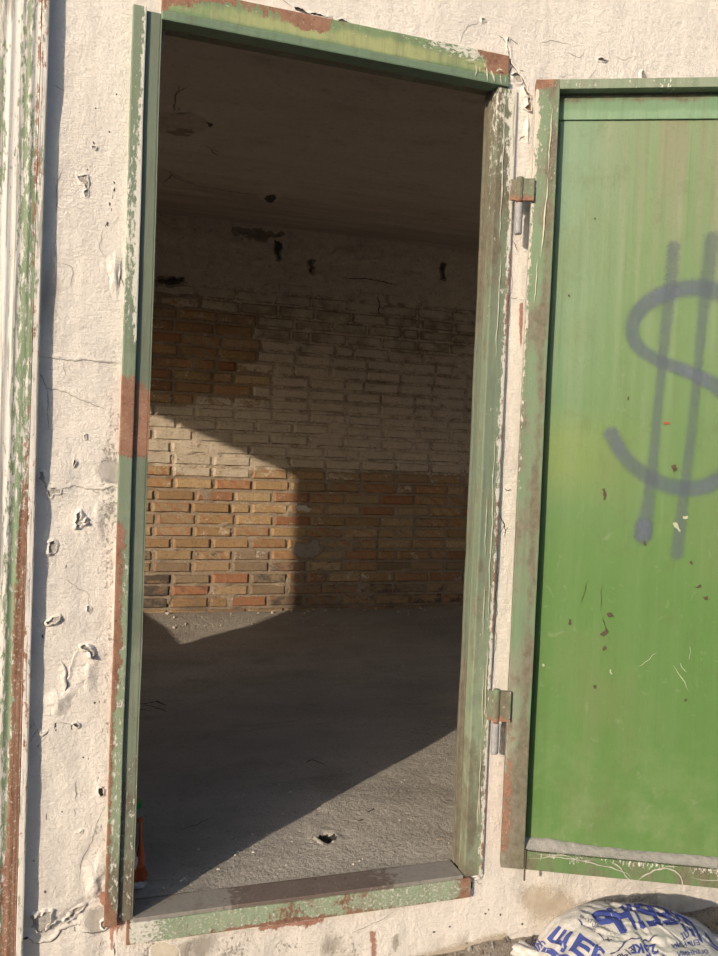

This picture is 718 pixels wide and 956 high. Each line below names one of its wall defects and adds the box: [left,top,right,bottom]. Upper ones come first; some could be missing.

spalling [292,6,347,22]
crack [500,36,531,103]
crack [39,353,122,427]
peeling [23,902,87,942]